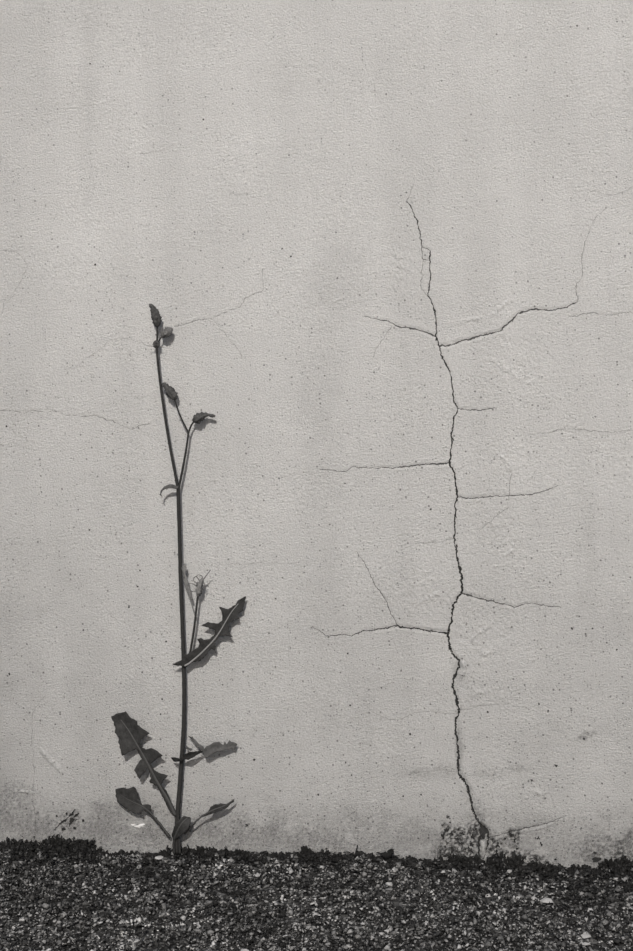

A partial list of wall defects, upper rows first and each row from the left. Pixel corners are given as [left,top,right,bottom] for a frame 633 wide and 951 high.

crack [312,184,633,859]